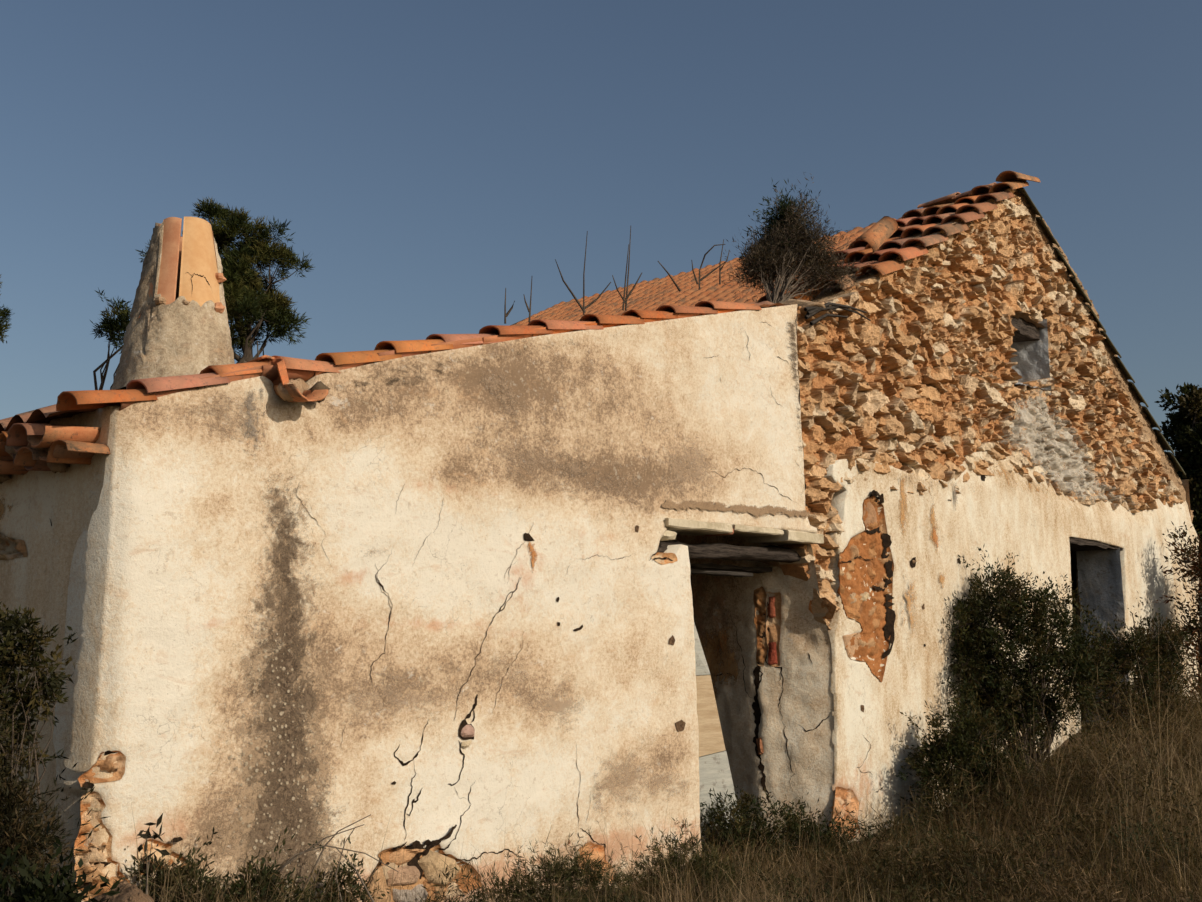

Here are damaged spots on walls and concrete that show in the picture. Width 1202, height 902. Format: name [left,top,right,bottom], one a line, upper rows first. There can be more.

spalling [778,187,1194,682]
spalling [0,533,27,560]
damp [208,475,343,892]
crack [370,509,442,711]
crack [394,522,534,861]
spalling [753,586,782,667]
crack [712,601,829,803]
spalling [74,750,191,901]
spalling [363,825,482,902]
spalling [828,787,861,844]